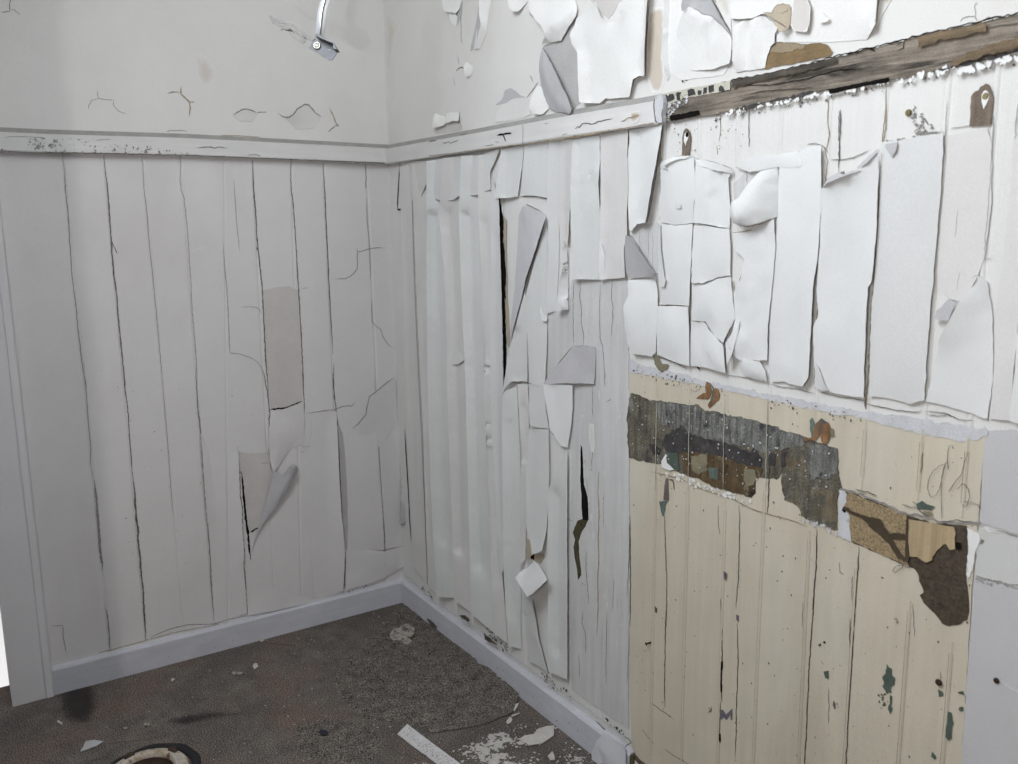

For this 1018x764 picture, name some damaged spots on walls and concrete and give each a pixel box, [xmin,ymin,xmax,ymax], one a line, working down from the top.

peeling [474,0,491,49]
peeling [508,0,648,103]
peeling [661,0,877,81]
peeling [431,112,459,128]
peeling [495,86,549,122]
peeling [969,84,994,127]
crack [4,86,401,653]
peeling [227,286,348,617]
crack [378,439,411,550]
crack [550,431,604,527]
peeling [399,123,1018,679]
crack [579,526,631,679]